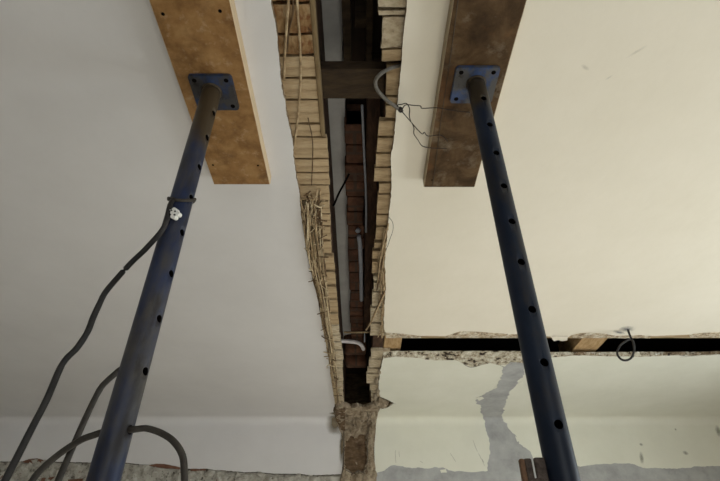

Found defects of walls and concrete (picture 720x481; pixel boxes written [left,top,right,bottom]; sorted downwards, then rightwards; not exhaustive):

spalling [552,333,650,341]
spalling [121,351,537,481]
spalling [0,458,91,481]
peeling [578,463,720,481]